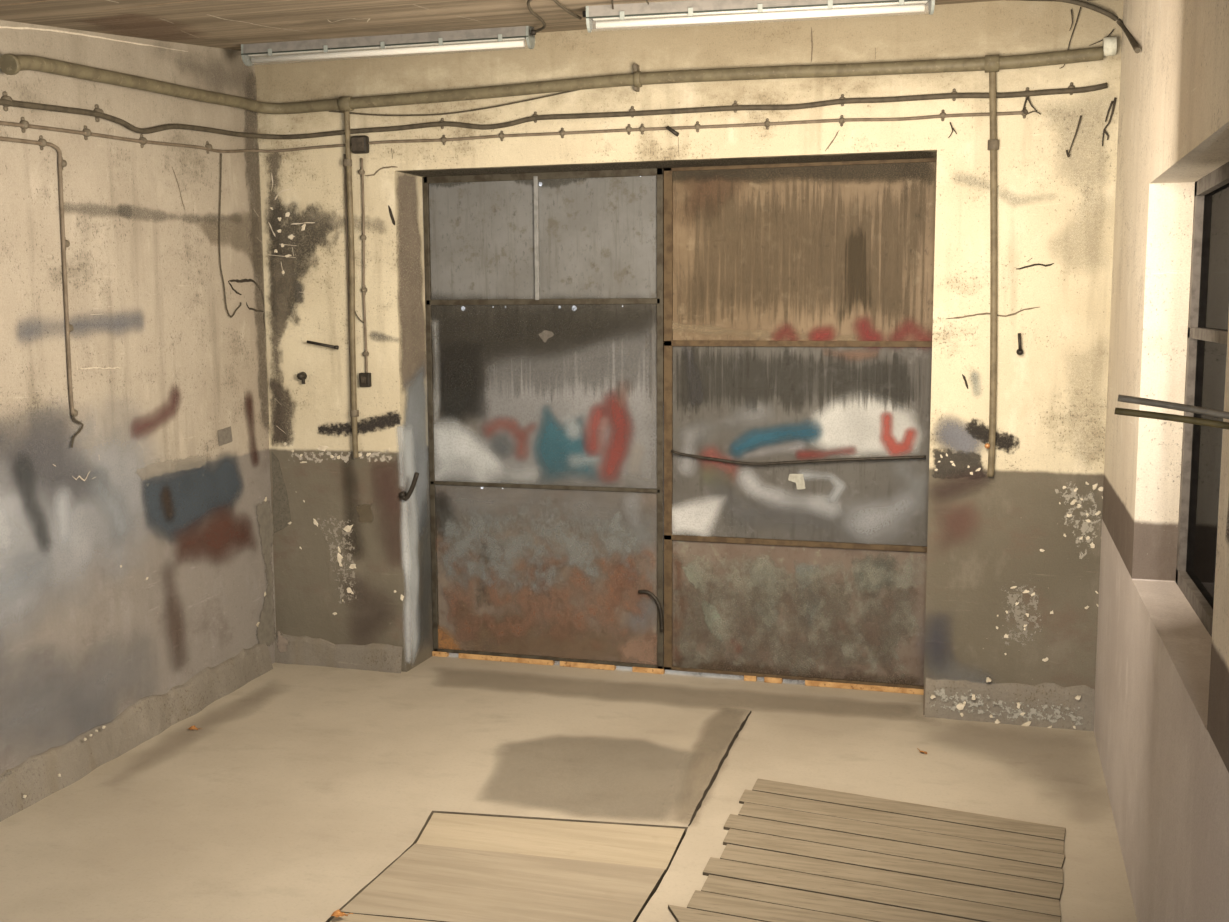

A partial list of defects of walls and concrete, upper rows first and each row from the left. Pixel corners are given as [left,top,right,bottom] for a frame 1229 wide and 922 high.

peeling [930,677,1083,729]